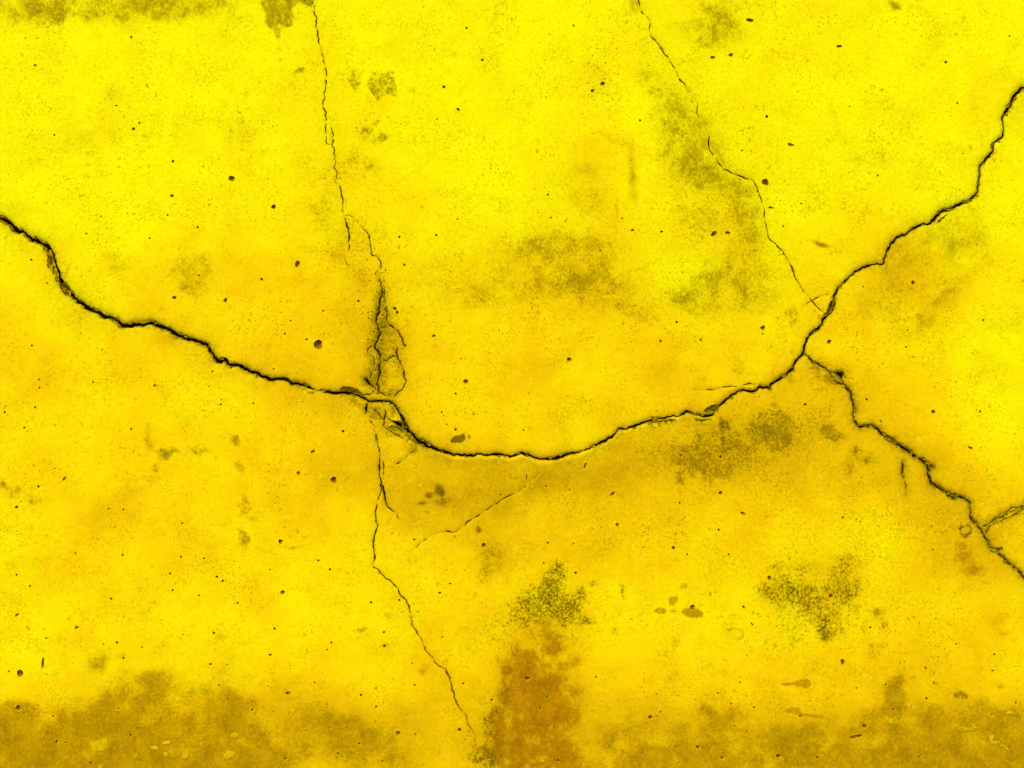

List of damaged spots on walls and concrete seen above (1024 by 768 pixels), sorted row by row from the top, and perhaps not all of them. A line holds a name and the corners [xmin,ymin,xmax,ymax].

crack [0,0,1024,578]
crack [370,421,476,749]
water stain [511,560,594,627]
water stain [758,556,858,641]
water stain [0,672,404,768]
water stain [472,710,504,768]
water stain [602,675,1024,768]